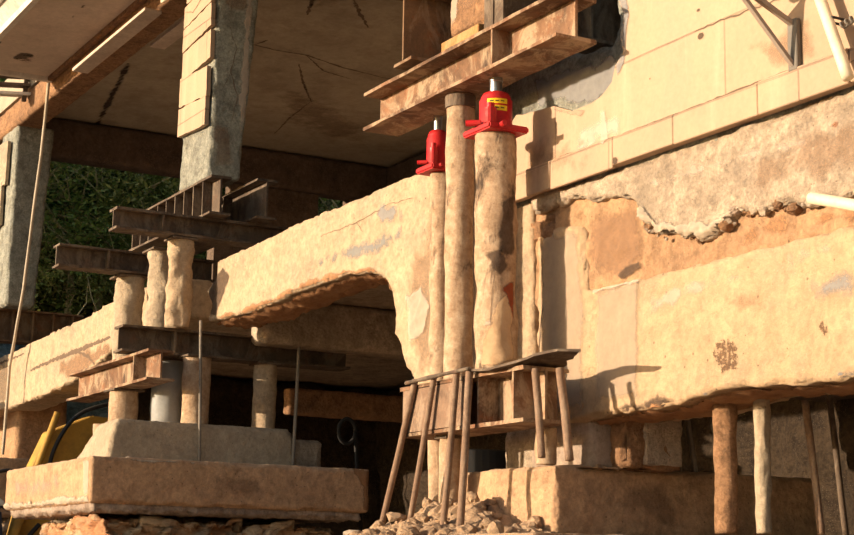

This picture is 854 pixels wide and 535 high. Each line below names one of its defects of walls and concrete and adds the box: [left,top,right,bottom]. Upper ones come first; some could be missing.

crack [353,0,369,28]
crack [96,63,129,124]
crack [224,27,388,134]
flaking render [531,90,854,273]
spalling [209,267,391,329]
water stain [712,339,738,373]